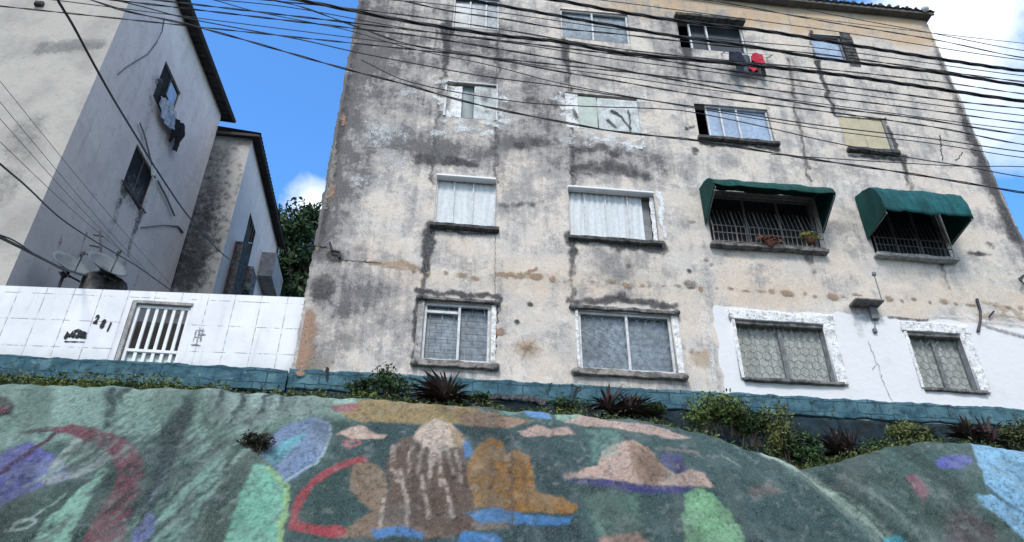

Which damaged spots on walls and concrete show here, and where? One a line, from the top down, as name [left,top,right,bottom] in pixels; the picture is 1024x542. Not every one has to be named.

peeling [430,79,511,137]
peeling [551,92,650,152]
leakage [787,57,812,181]
leakage [808,30,837,117]
leakage [171,150,228,293]
leakage [411,221,503,359]
leakage [564,230,678,309]